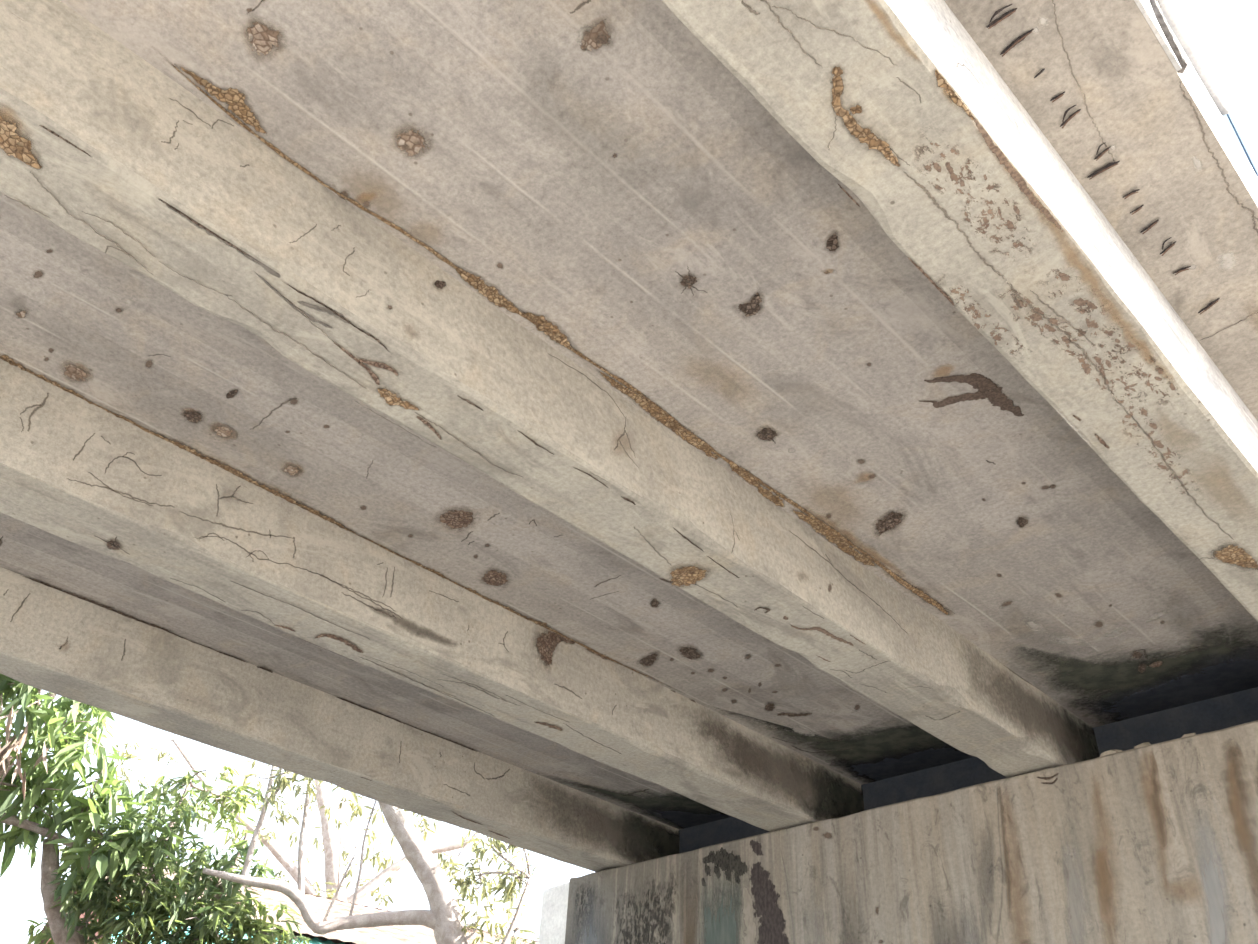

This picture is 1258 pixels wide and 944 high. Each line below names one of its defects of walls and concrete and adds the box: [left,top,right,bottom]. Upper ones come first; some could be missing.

spalling [916,69,1063,255]
spalling [1087,142,1120,180]
crack [1180,82,1258,233]
crack [5,171,522,477]
spalling [159,199,390,352]
peeling [908,257,1195,495]
crack [887,146,1233,560]
crack [69,433,621,754]
damp [543,781,732,861]
damp [709,713,975,818]
damp [985,629,1258,761]
rust [1228,748,1258,893]